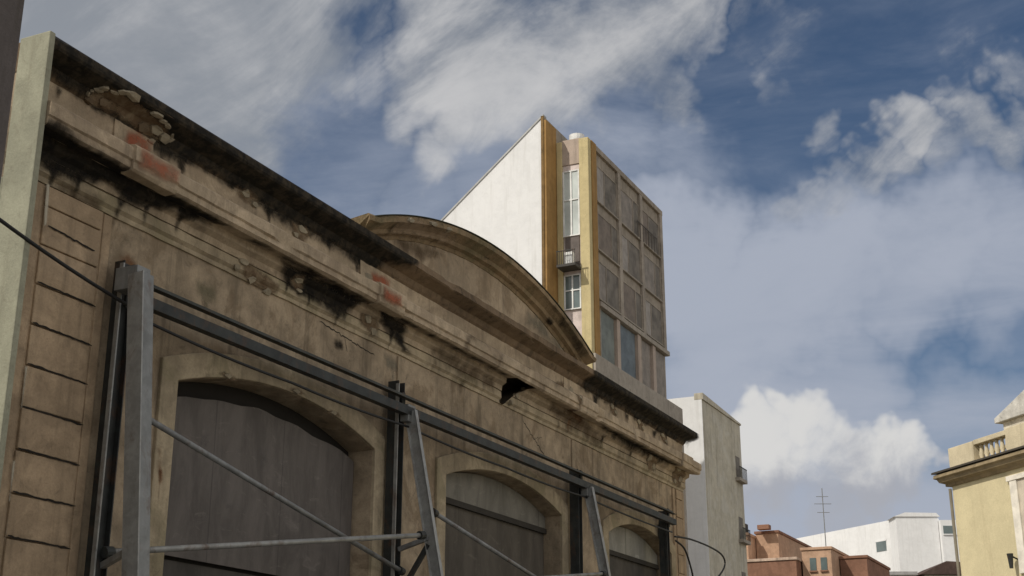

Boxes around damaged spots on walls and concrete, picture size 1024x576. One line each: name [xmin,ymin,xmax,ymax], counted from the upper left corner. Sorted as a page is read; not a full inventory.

spalling [83,86,175,145]
water stain [51,36,429,273]
water stain [45,165,57,225]
crack [320,321,374,354]
spalling [500,378,529,406]
water stain [583,370,699,444]